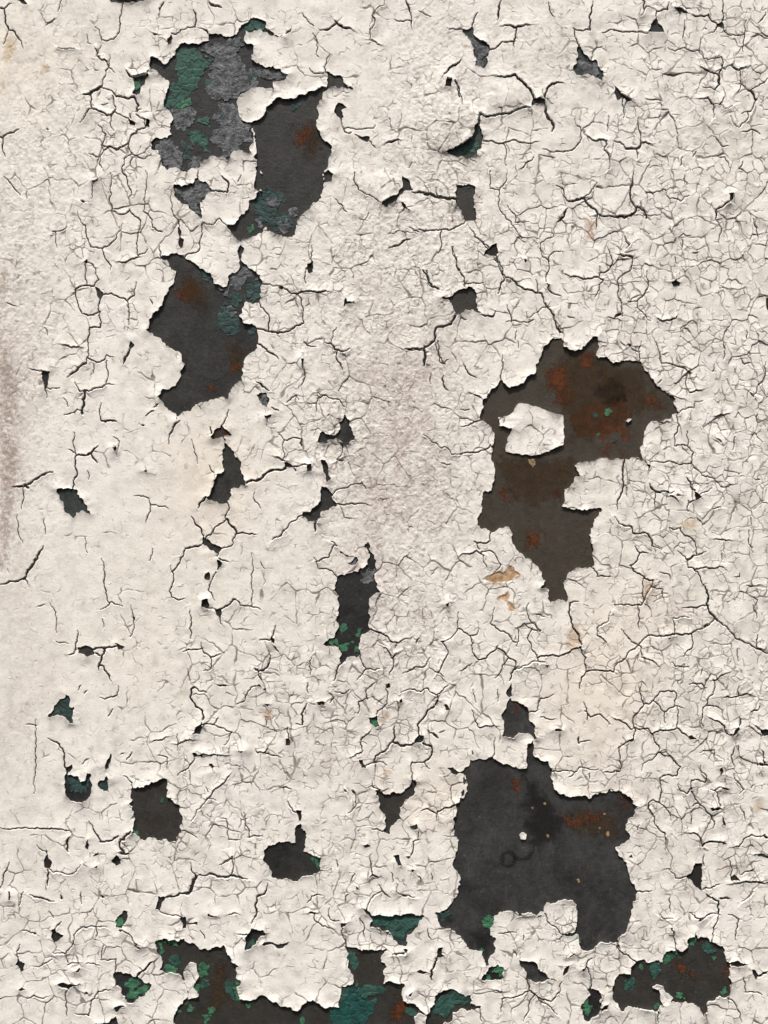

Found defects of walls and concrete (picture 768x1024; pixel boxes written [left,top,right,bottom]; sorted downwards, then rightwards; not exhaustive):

peeling [129,18,353,419]
crack [0,0,229,717]
crack [149,250,350,938]
peeling [323,542,380,664]
crack [256,0,768,949]
peeling [477,337,679,603]
rust [570,395,632,458]
crack [0,822,153,1016]
peeling [129,778,183,842]
peeling [155,684,637,1024]
crack [480,932,562,1022]
peeling [580,934,758,1021]